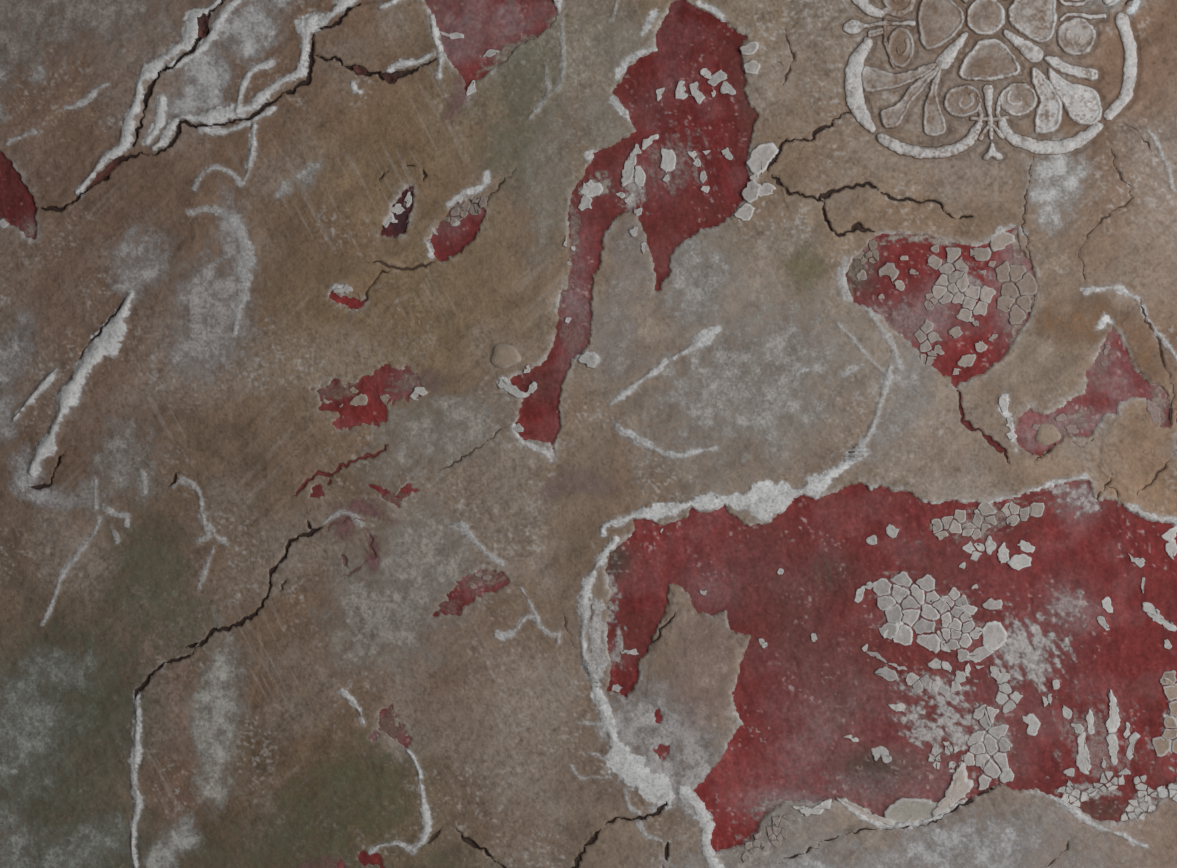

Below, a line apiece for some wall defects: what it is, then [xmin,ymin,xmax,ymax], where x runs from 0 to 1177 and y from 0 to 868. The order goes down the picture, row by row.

damp [0,313,155,517]
crack [42,0,435,212]
peeling [425,0,563,96]
peeling [497,0,779,462]
crack [767,112,973,237]
peeling [837,225,1038,387]
peeling [998,314,1171,457]
crack [135,517,376,699]
peeling [577,366,1177,868]
damp [598,626,732,817]
crack [420,829,506,868]
crack [572,801,667,868]